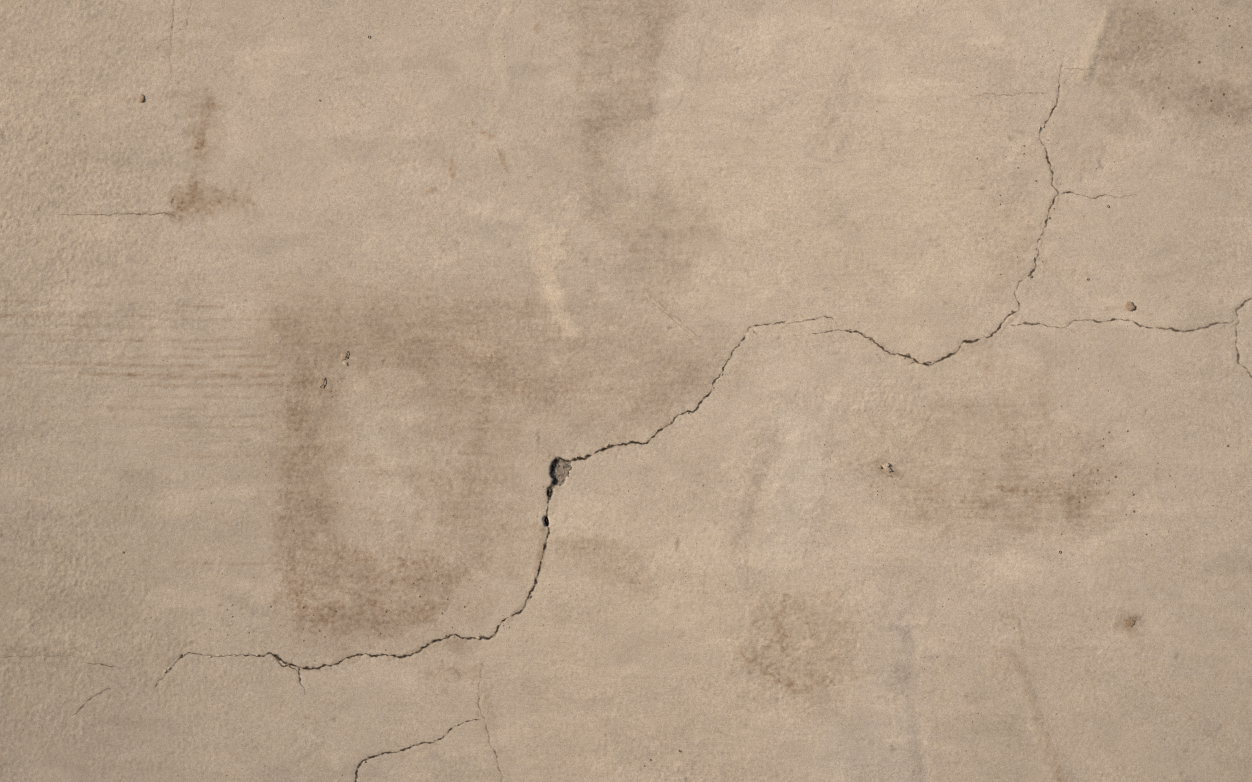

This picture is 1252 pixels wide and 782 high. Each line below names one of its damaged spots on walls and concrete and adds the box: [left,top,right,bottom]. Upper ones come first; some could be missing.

water stain [231,0,767,735]
crack [155,67,1103,688]
crack [1093,299,1252,378]
crack [354,699,499,782]